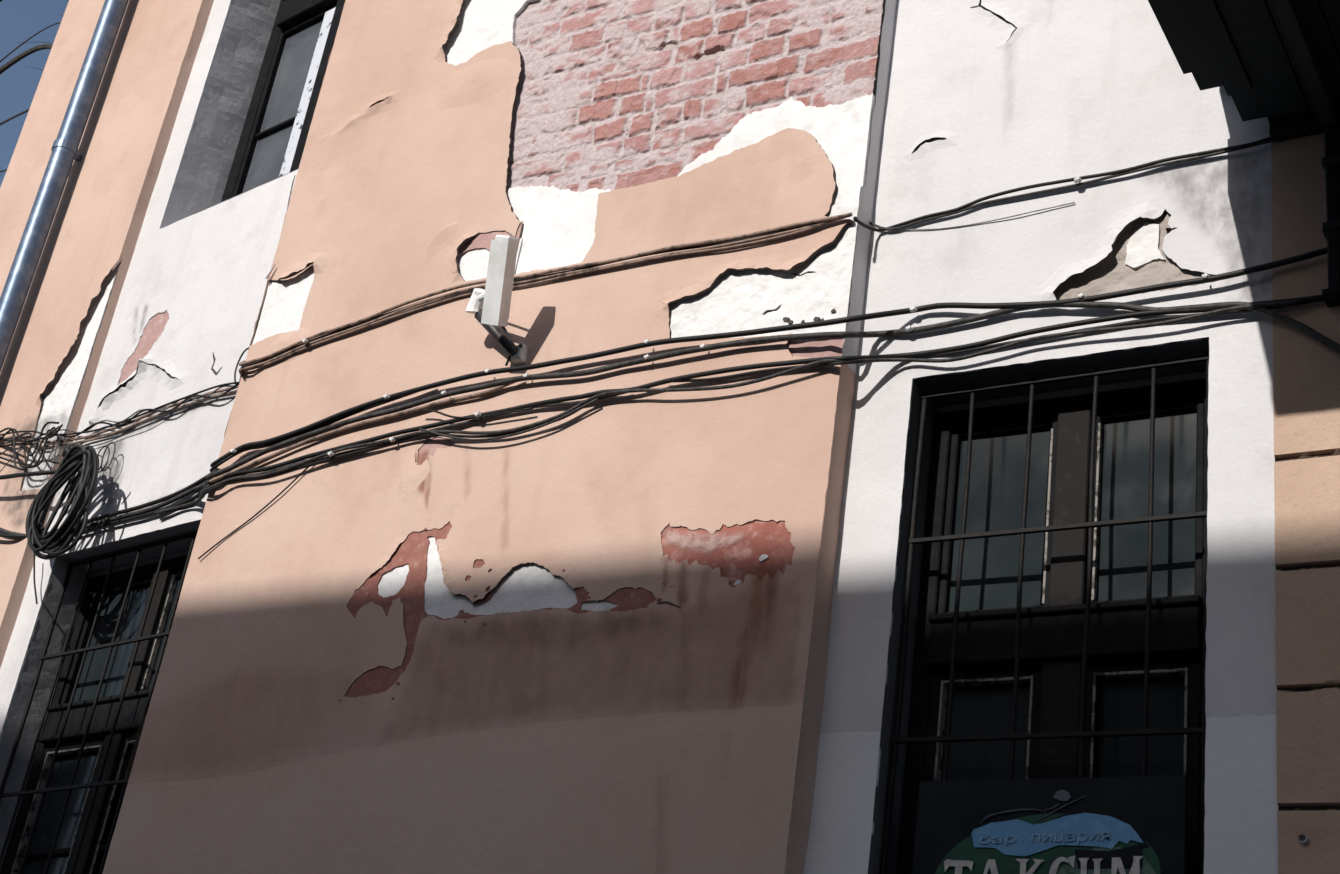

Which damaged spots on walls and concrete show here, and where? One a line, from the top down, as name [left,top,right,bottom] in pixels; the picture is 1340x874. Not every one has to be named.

crack [970,0,1017,29]
flaking render [444,0,883,358]
spalling [1054,211,1216,300]
flaking render [22,265,120,491]
peeling [119,311,169,384]
peeling [251,264,314,345]
peeling [661,520,795,588]
peeling [339,522,682,701]